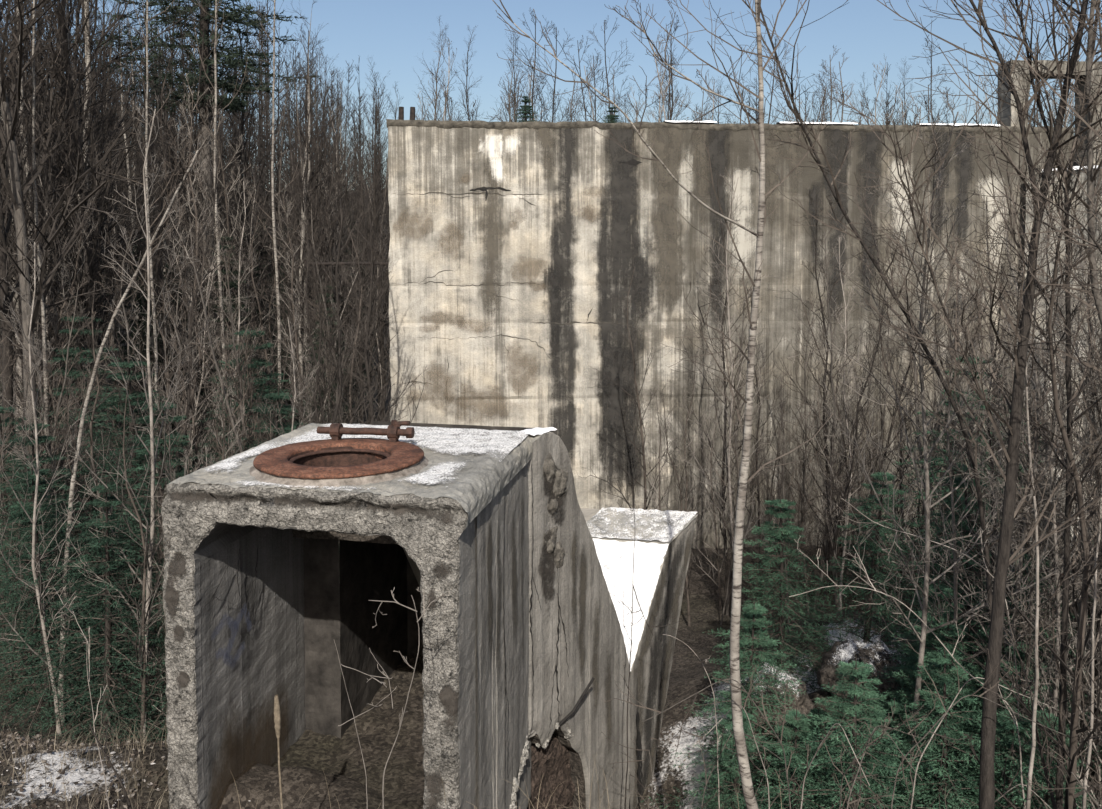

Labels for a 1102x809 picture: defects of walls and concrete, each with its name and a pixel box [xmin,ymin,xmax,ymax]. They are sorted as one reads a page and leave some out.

water stain [431,312,482,332]
crack [393,192,556,206]
water stain [481,161,506,314]
water stain [535,127,756,494]
water stain [765,129,802,219]
water stain [809,129,912,319]
water stain [539,466,565,600]
crack [473,563,481,782]
crack [503,465,569,774]
spalling [509,722,574,809]